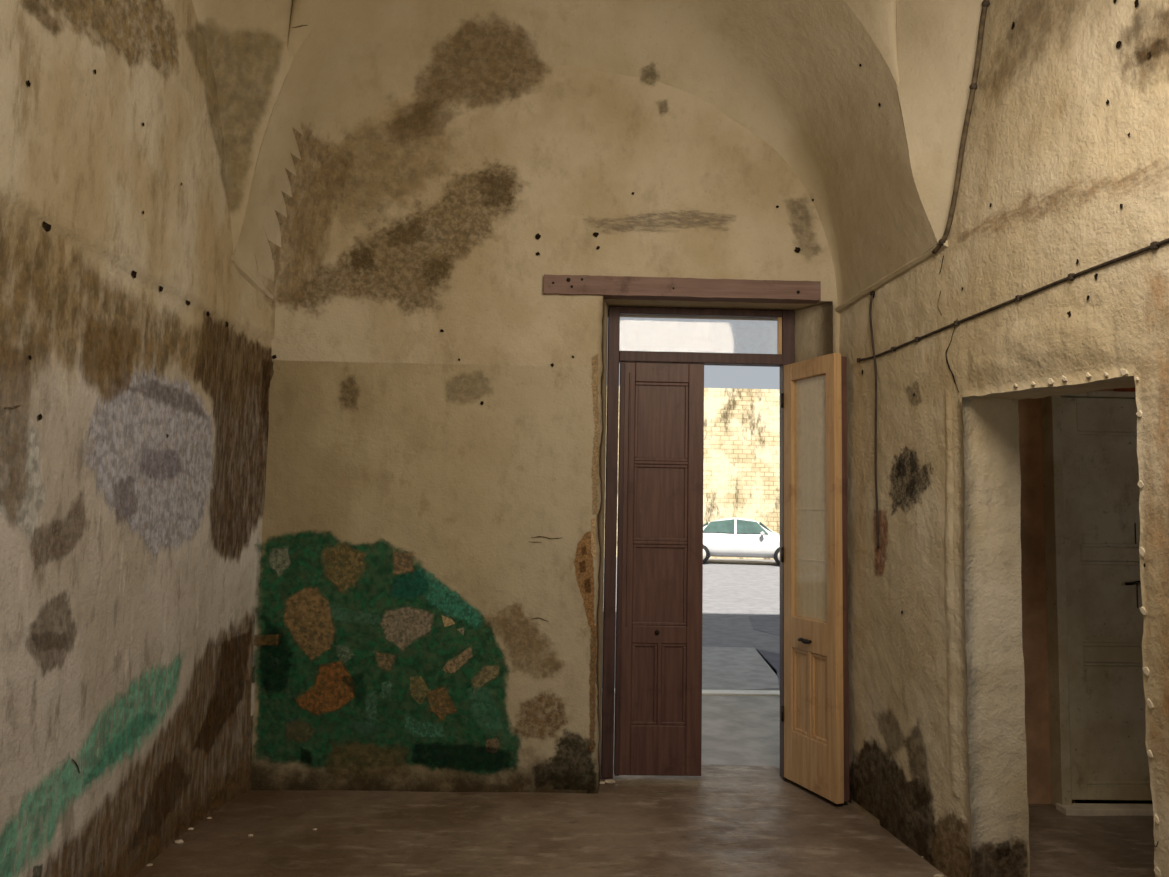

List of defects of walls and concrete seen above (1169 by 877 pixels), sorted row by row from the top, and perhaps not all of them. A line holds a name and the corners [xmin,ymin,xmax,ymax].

mould [420,24,542,115]
damp [1124,13,1169,76]
damp [266,129,516,308]
damp [0,222,274,560]
mould [889,447,931,513]
damp [516,695,597,794]
damp [848,728,1028,877]